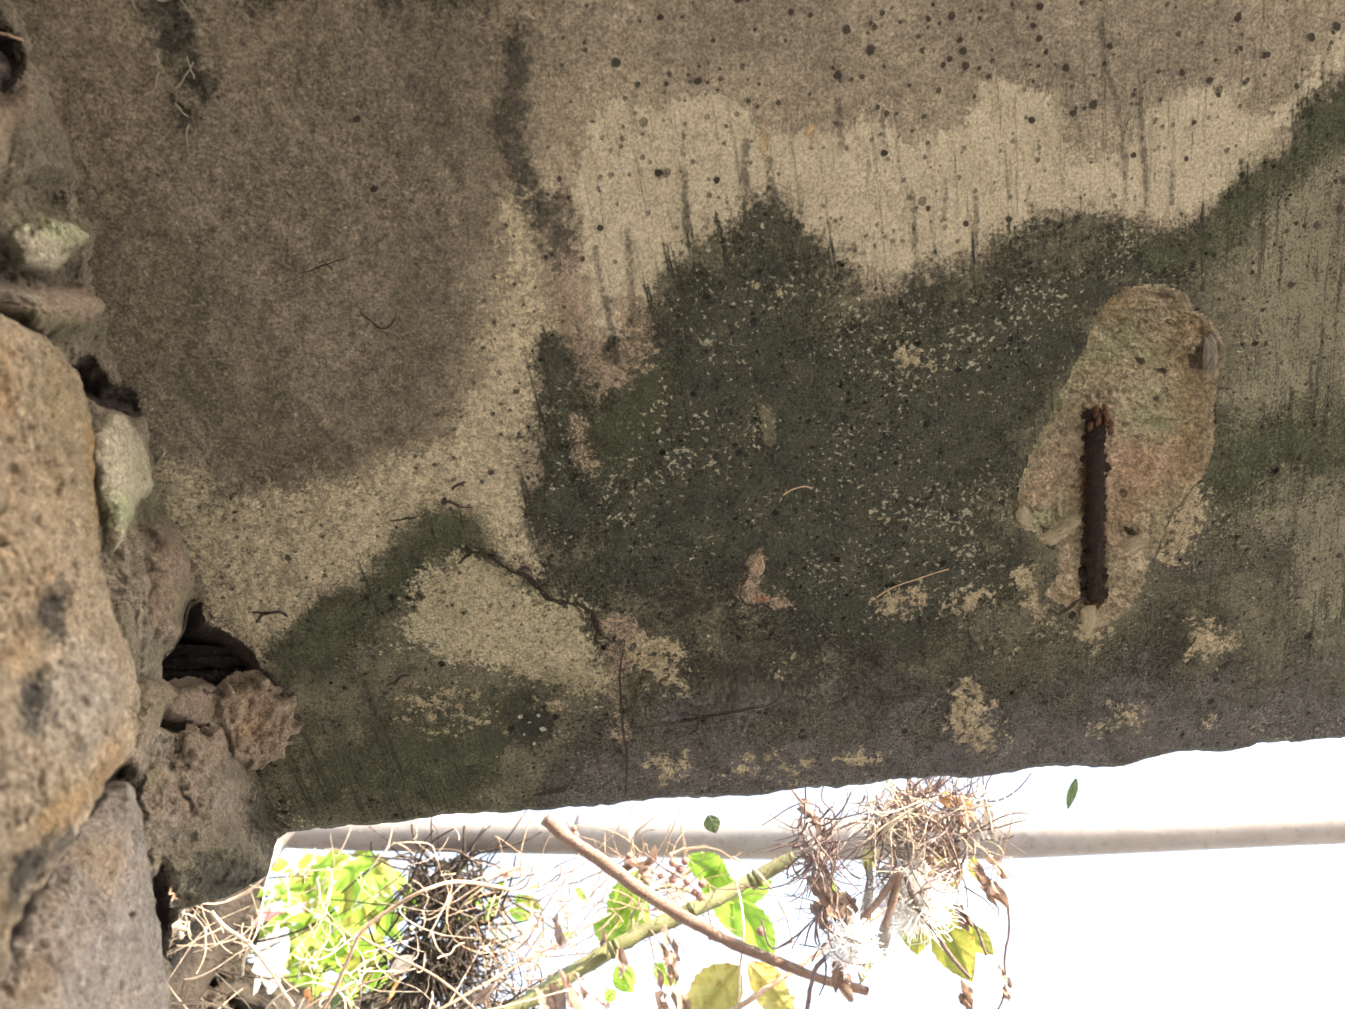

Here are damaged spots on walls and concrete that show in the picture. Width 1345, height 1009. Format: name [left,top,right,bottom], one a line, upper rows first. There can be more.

water stain [152,19,1345,669]
crack [390,481,473,521]
spalling [868,284,1228,667]
corrosion [1079,408,1107,609]
spalling [163,598,277,696]
crack [387,674,411,686]
crack [458,548,782,796]